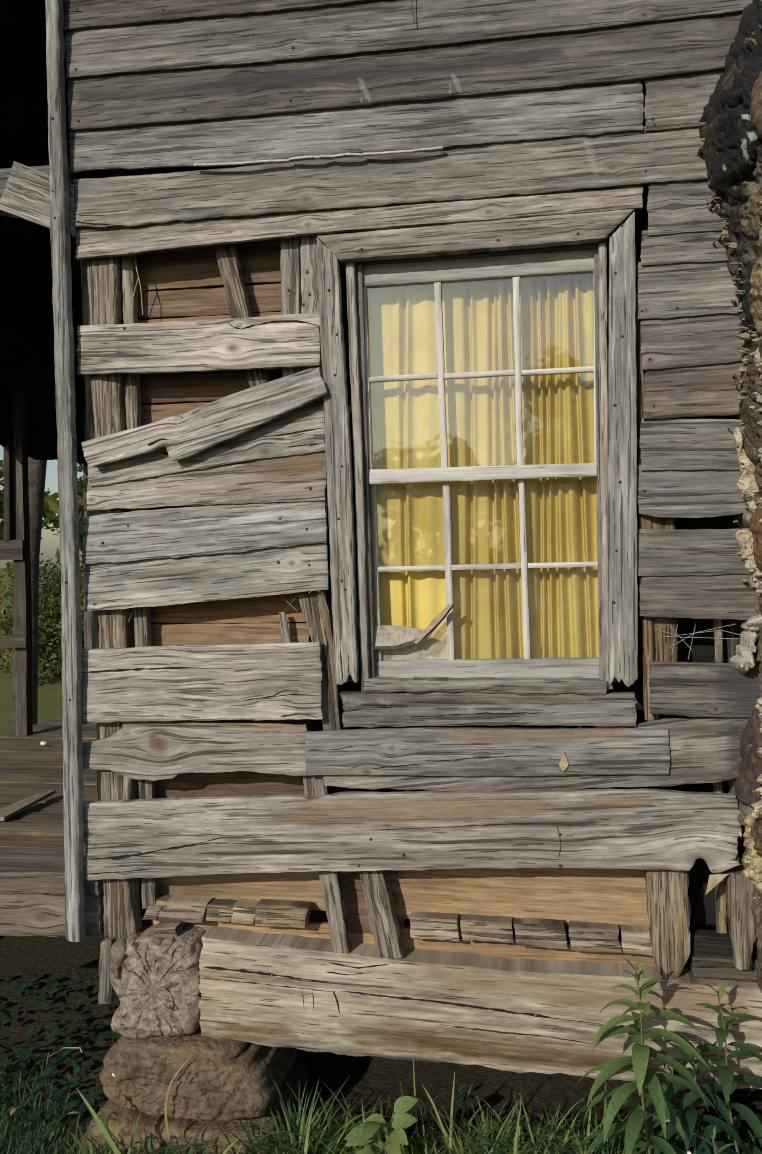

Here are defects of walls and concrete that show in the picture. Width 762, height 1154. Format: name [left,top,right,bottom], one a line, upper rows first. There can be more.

crack [148,417,182,455]
crack [262,428,325,447]
crack [128,951,606,1046]